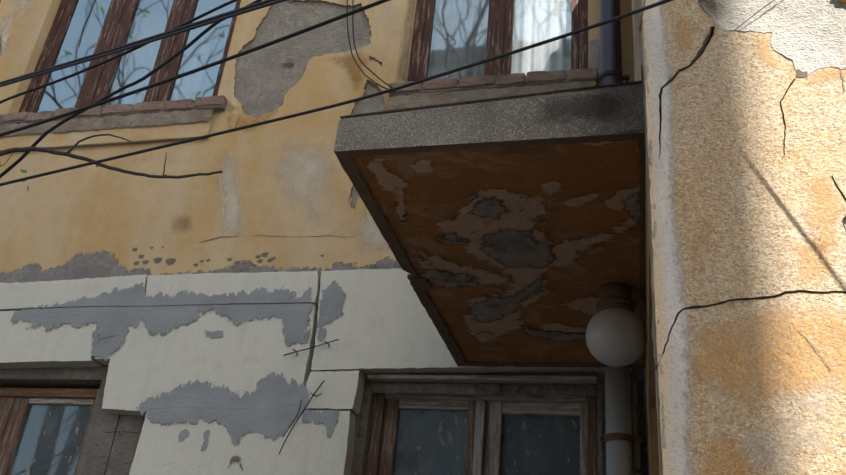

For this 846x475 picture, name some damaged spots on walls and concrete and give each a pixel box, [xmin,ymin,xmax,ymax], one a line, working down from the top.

spalling [0,109,213,137]
flaking render [234,0,372,118]
spalling [351,39,600,115]
crack [659,27,715,159]
crack [735,0,775,30]
spalling [699,0,846,80]
crack [780,79,795,155]
peeling [367,158,417,227]
peeling [132,246,175,265]
peeling [407,181,645,343]